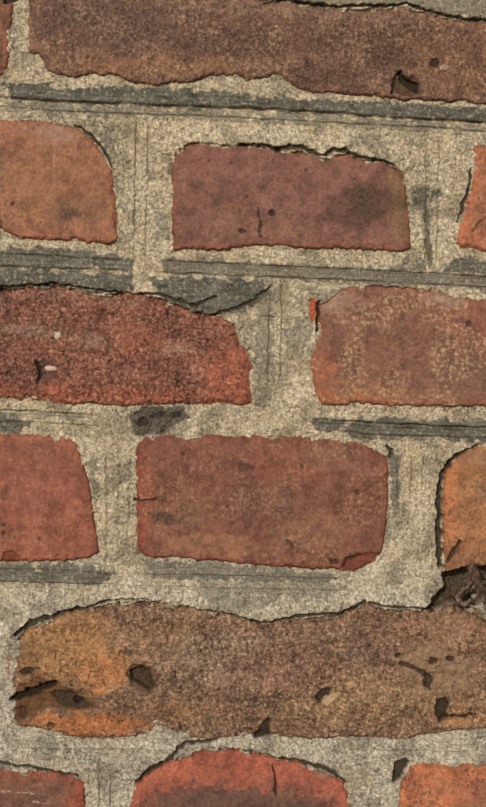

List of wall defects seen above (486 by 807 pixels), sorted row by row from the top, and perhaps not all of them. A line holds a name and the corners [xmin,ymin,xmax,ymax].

crack [0,282,271,316]
spalling [9,667,99,726]
crack [0,760,79,777]
crack [135,738,347,795]